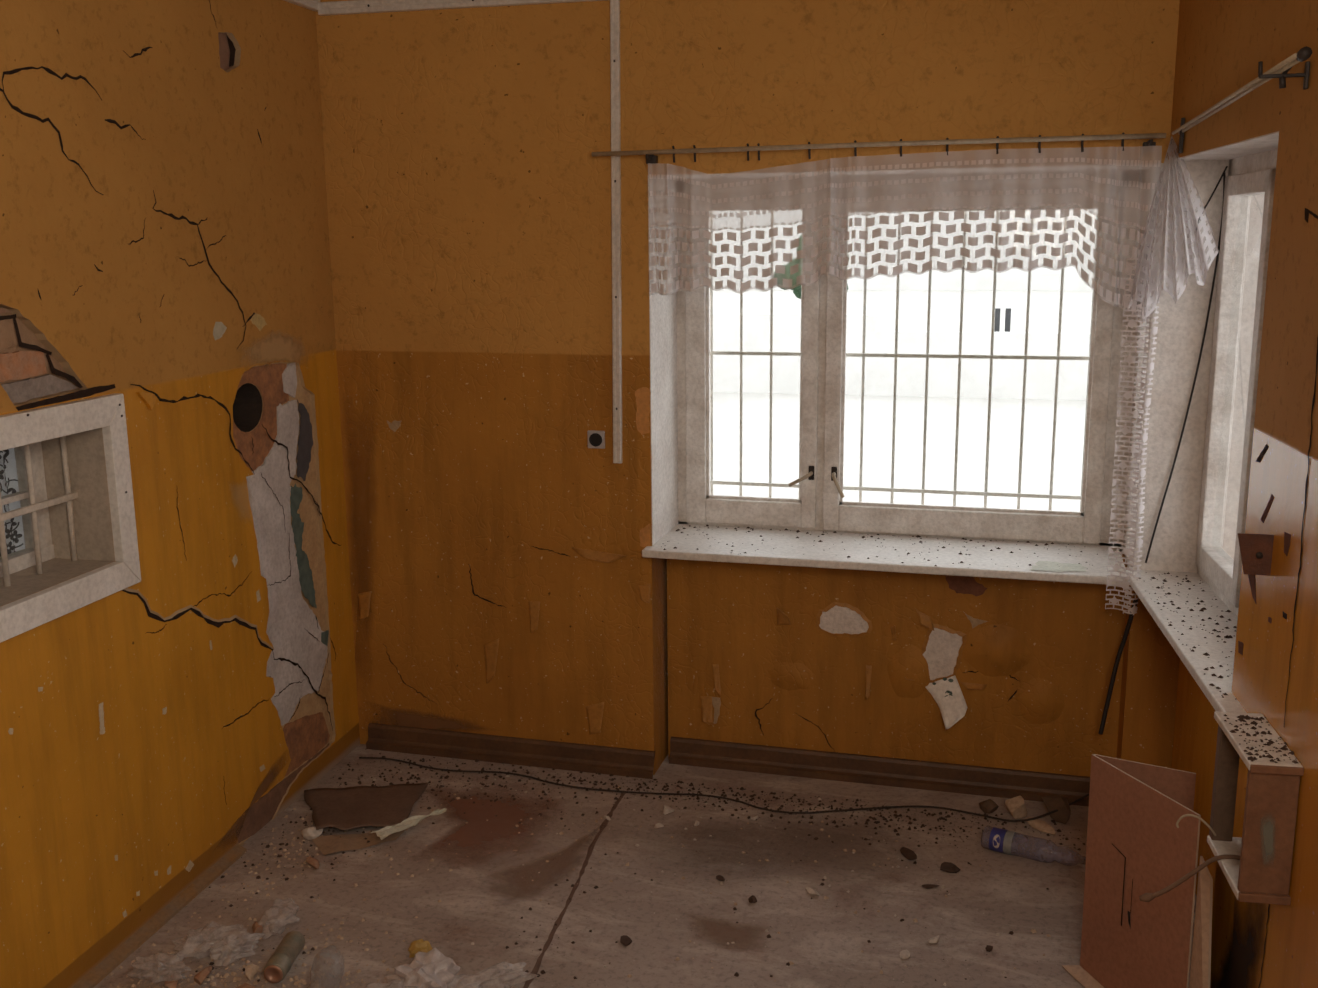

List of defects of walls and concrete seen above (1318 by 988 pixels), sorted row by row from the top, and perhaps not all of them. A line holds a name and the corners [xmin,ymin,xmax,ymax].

crack [125,47,153,58]
flaking render [218,32,241,72]
crack [0,66,143,195]
crack [129,190,255,349]
flaking render [0,304,116,411]
crack [130,384,255,475]
crack [122,573,274,650]
flaking render [233,361,336,846]
flaking render [815,602,873,638]
flaking render [915,608,987,683]
flaking render [945,576,988,596]
crack [222,700,268,729]